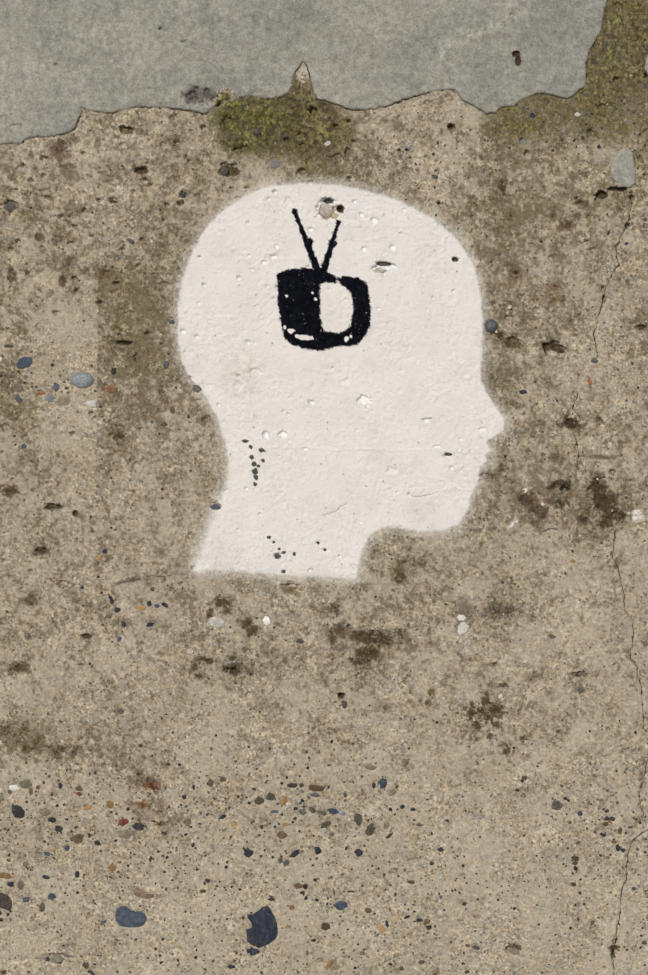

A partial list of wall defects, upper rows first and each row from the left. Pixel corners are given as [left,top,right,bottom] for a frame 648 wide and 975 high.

spalling [511,49,522,67]
peeling [296,63,309,84]
spalling [177,79,222,109]
spalling [118,124,135,135]
spalling [133,166,150,175]
spalling [216,164,241,179]
peeling [594,149,636,200]
crack [568,191,632,471]
spalling [241,439,267,487]
crack [612,530,647,732]
crack [612,760,648,975]